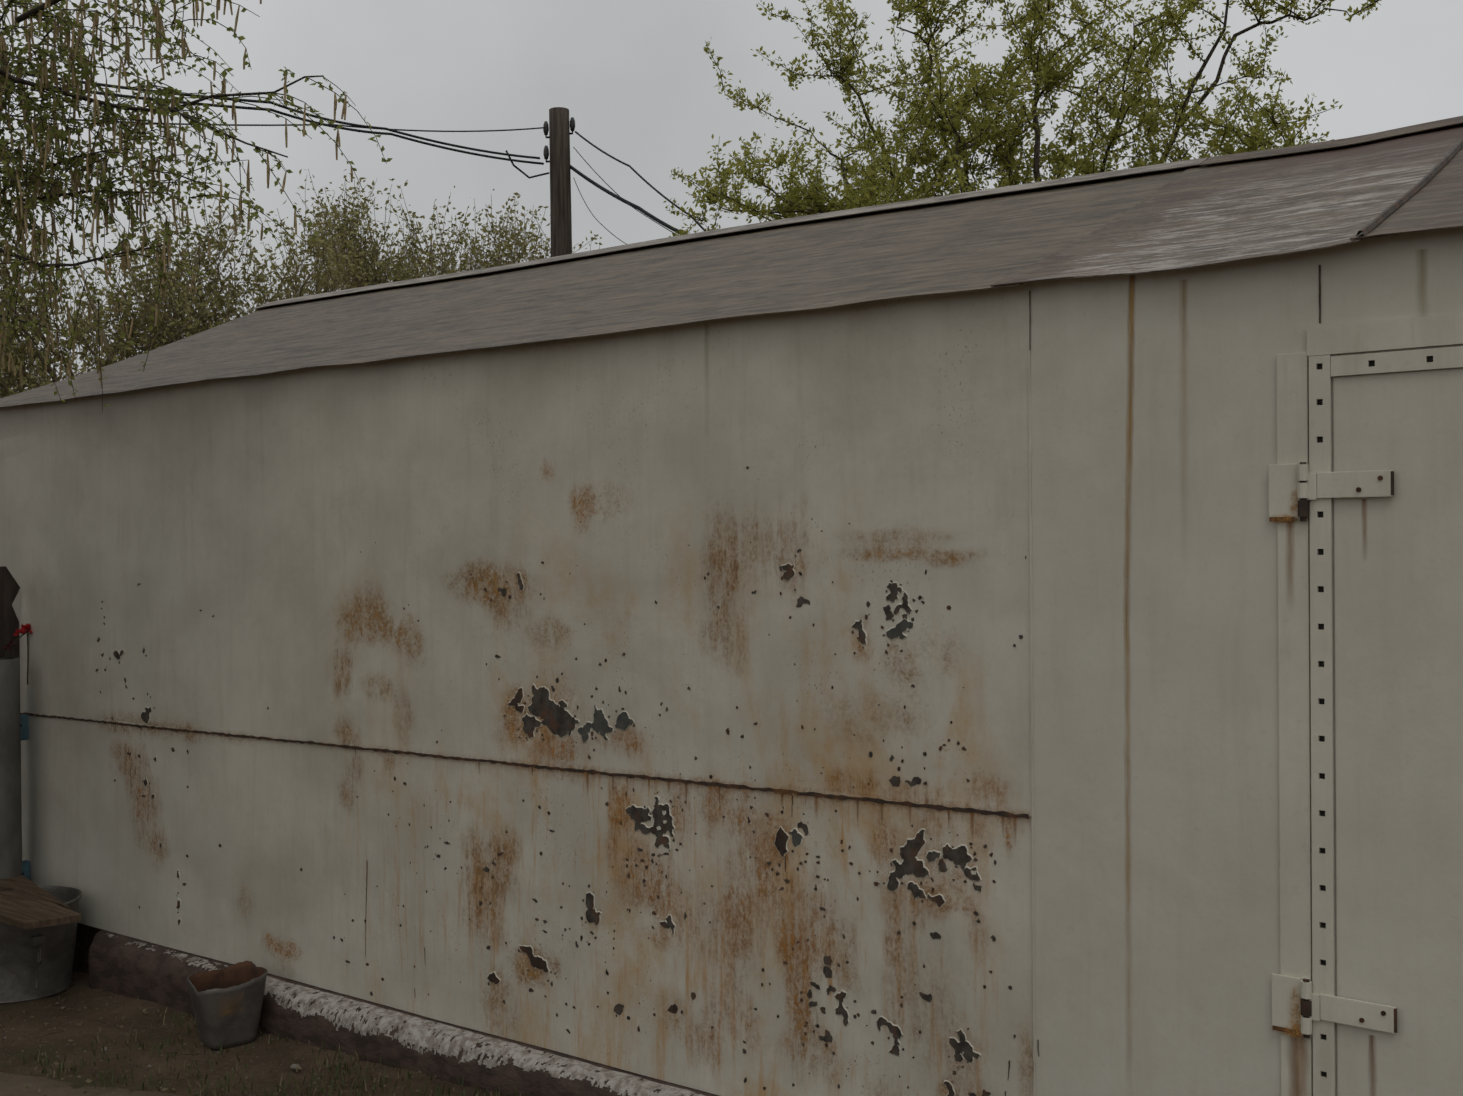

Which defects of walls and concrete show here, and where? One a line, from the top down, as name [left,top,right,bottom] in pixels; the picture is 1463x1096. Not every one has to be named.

corrosion [343,598,422,657]
peeling [851,580,925,654]
peeling [508,657,668,759]
peeling [605,792,687,936]
peeling [747,806,826,911]
peeling [840,824,996,909]
peeling [103,933,228,971]
peeling [264,960,705,1096]
peeling [486,884,602,997]
corrosion [779,880,846,1058]
peeling [800,956,932,1058]
peeling [942,1028,991,1096]